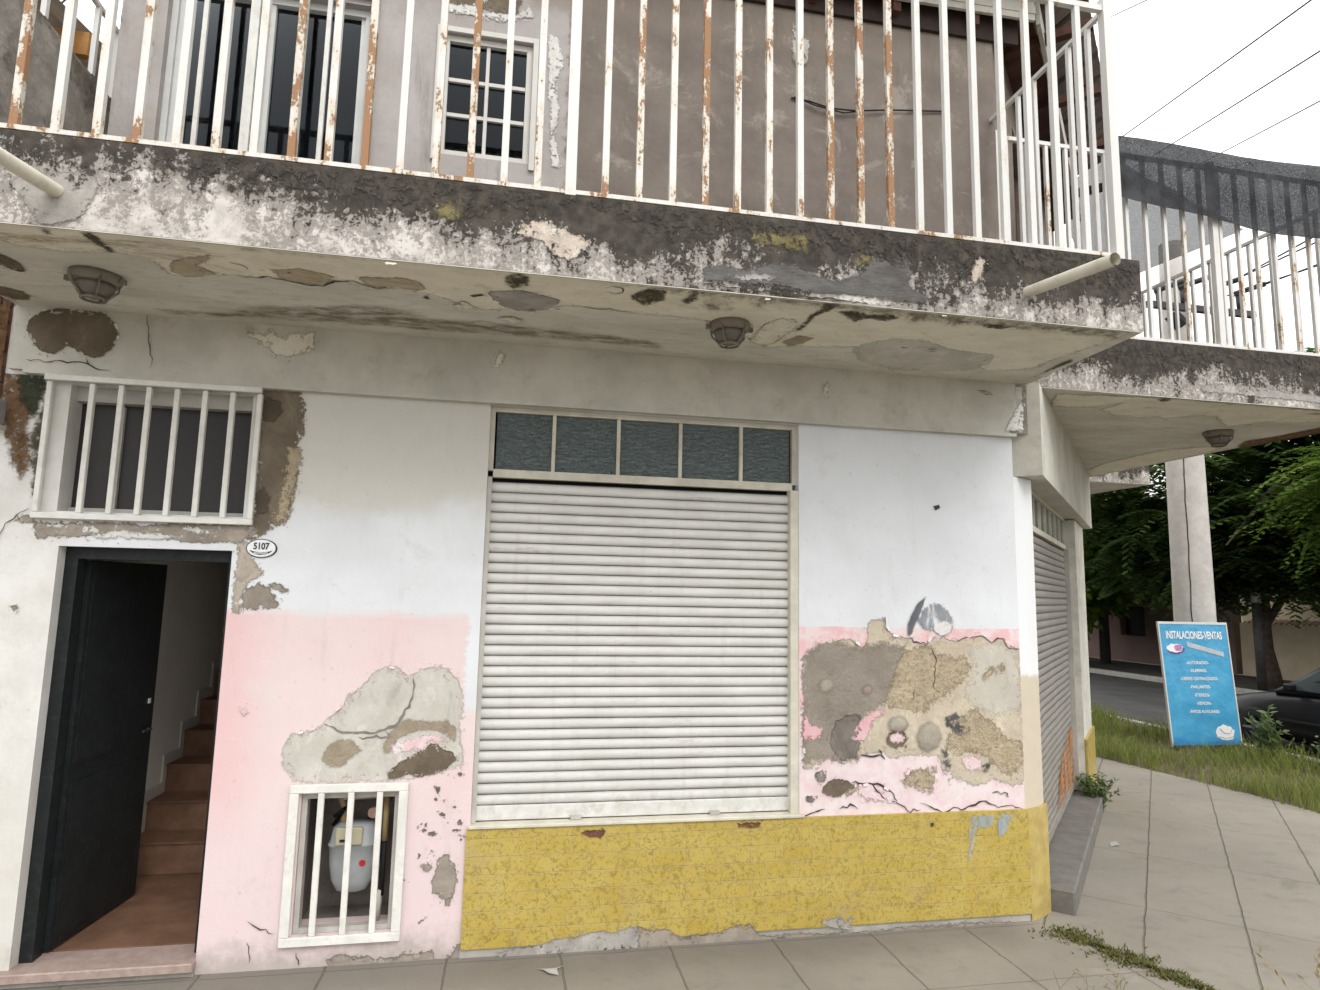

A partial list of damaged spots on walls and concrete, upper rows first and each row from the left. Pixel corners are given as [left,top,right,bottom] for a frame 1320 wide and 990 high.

water stain [65,163,89,189]
peeling [0,218,1133,373]
water stain [133,149,1320,378]
peeling [1050,393,1320,426]
flaking render [14,390,307,614]
crack [325,678,415,739]
peeling [281,664,466,906]
peeling [801,616,1024,806]
crack [805,750,1022,816]
spalling [496,907,1012,957]